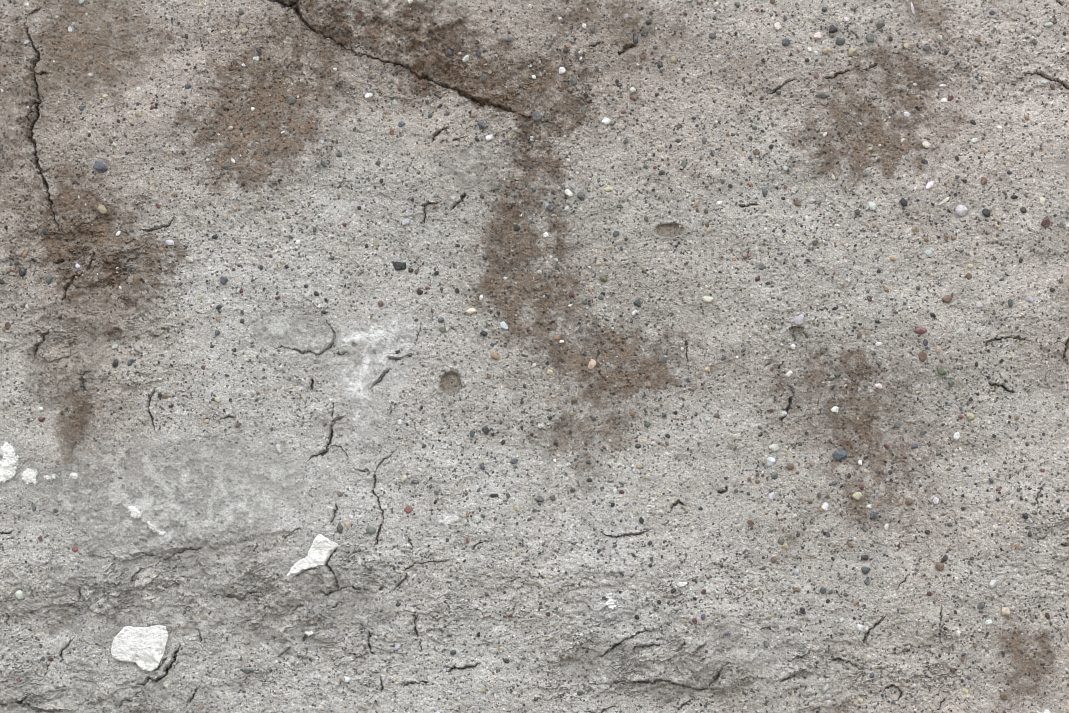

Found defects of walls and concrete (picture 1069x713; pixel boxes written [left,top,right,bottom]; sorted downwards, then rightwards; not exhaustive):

crack [24,6,95,361]
leakage [40,165,187,311]
leakage [176,0,681,476]
leakage [790,45,937,180]
crack [272,320,484,592]
crack [326,504,365,608]
crack [138,632,202,686]
crack [368,631,480,712]